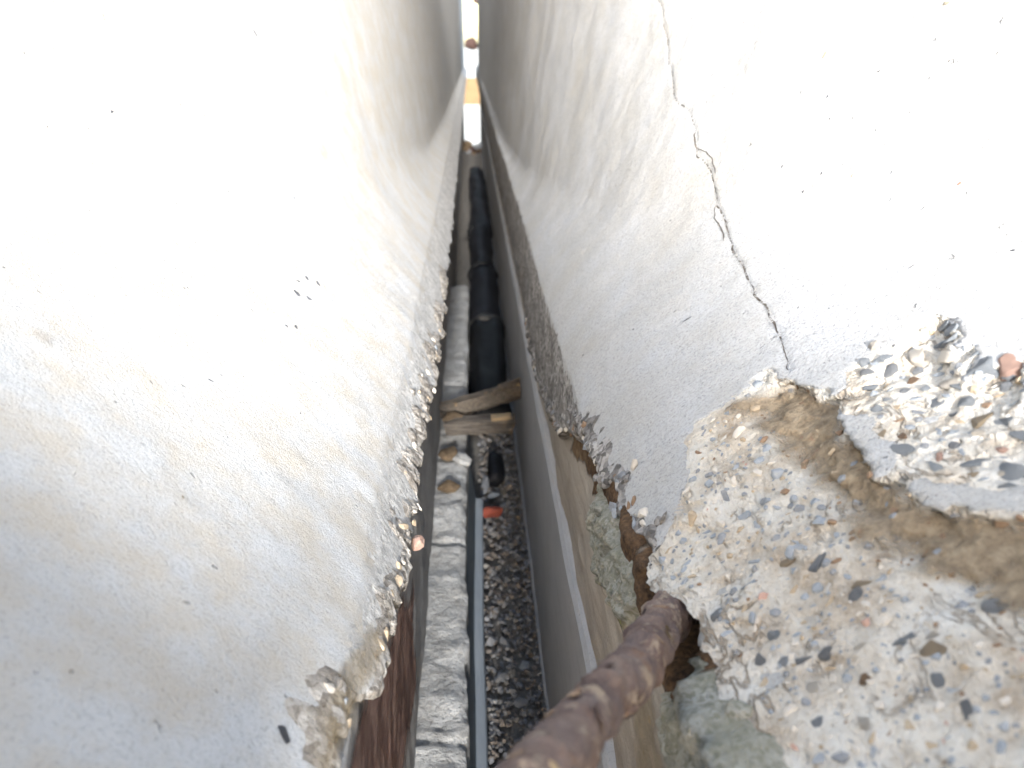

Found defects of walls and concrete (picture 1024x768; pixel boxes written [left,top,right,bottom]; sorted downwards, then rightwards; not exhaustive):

crack [659,1,788,370]
spalling [278,264,448,768]
rust [662,620,719,702]
spalling [496,315,1024,768]